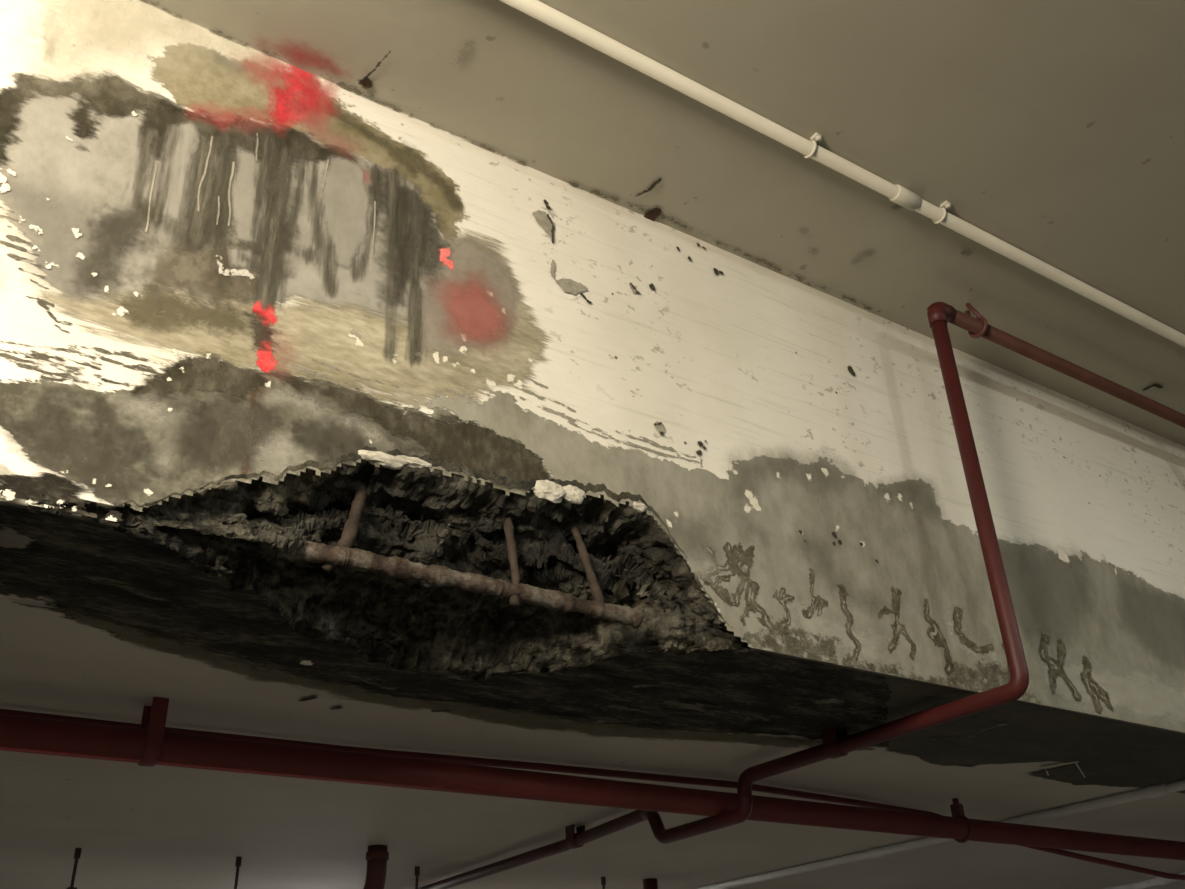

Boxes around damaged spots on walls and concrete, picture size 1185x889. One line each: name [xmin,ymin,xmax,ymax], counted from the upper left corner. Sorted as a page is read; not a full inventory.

water stain [0,43,1010,748]
spalling [0,446,752,680]
crack [694,542,1010,676]
water stain [859,539,1185,794]
crack [1039,633,1114,714]